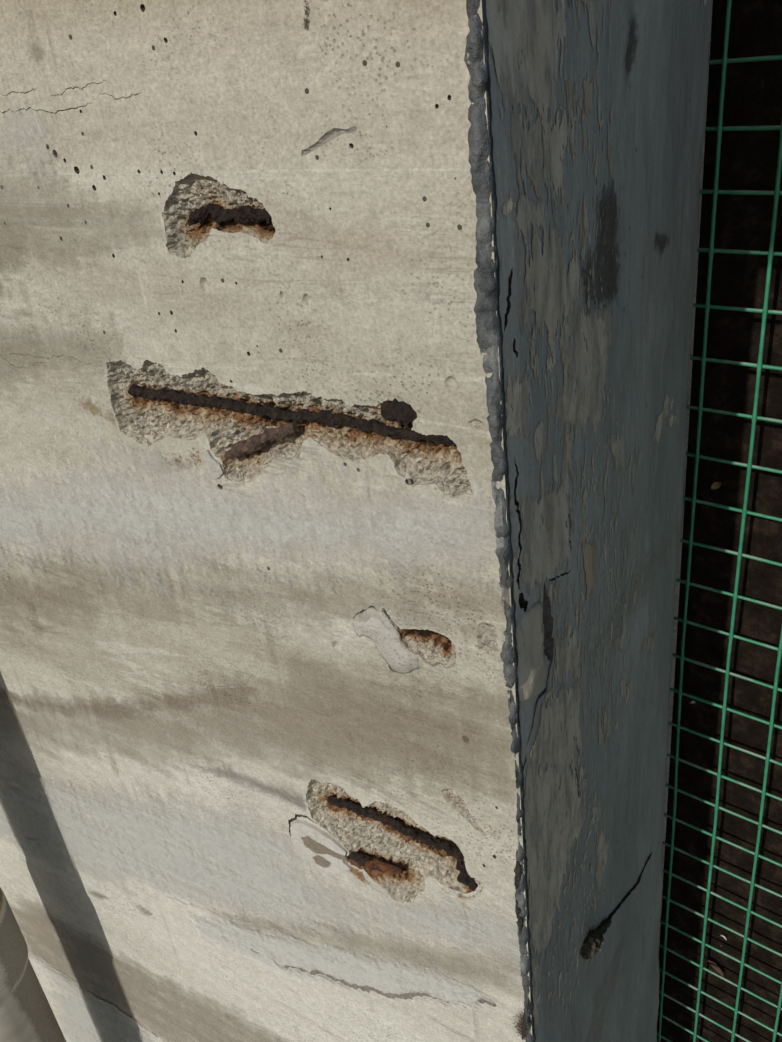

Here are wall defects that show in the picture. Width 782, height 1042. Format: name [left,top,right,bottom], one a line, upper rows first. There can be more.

spalling [162,173,276,259]
peeling [486,0,584,341]
spalling [106,360,473,498]
peeling [504,371,532,439]
spalling [382,607,457,668]
peeling [499,482,587,1040]
spalling [290,779,480,903]
crack [272,955,497,1007]